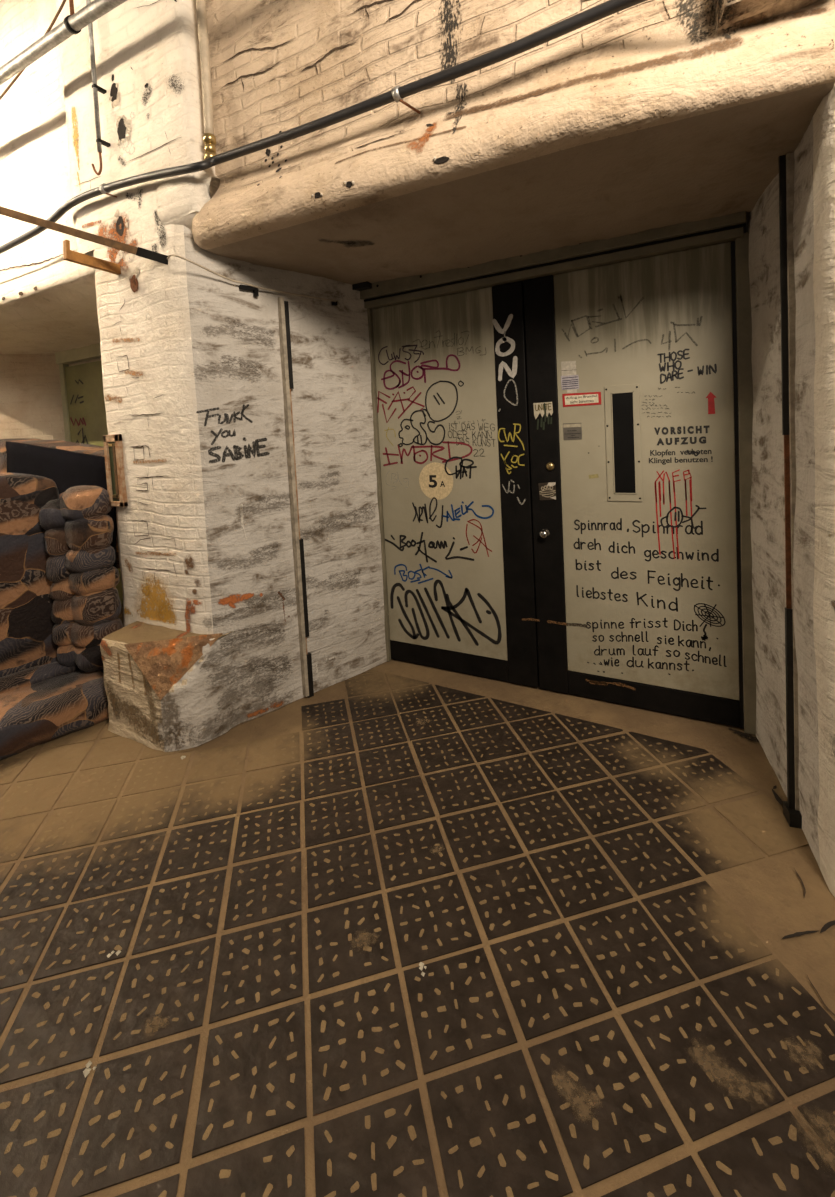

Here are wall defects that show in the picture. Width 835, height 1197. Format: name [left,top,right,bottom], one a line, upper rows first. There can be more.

crack [219,0,419,90]
damp [438,0,468,134]
mould [674,0,738,44]
rust [82,216,138,293]
spalling [124,633,223,700]